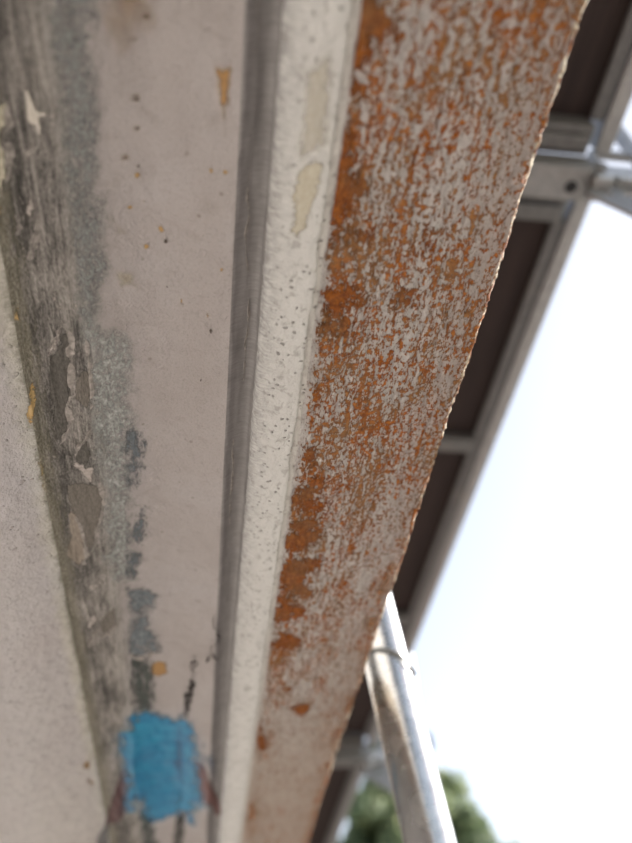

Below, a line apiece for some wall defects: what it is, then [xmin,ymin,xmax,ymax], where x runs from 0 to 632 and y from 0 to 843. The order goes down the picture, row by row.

peeling [0,60,56,199]
corrosion [216,69,229,105]
peeling [15,197,42,263]
peeling [47,317,108,568]
water stain [51,0,160,712]
corrosion [244,0,587,843]
crack [183,616,220,718]
water stain [136,808,159,843]